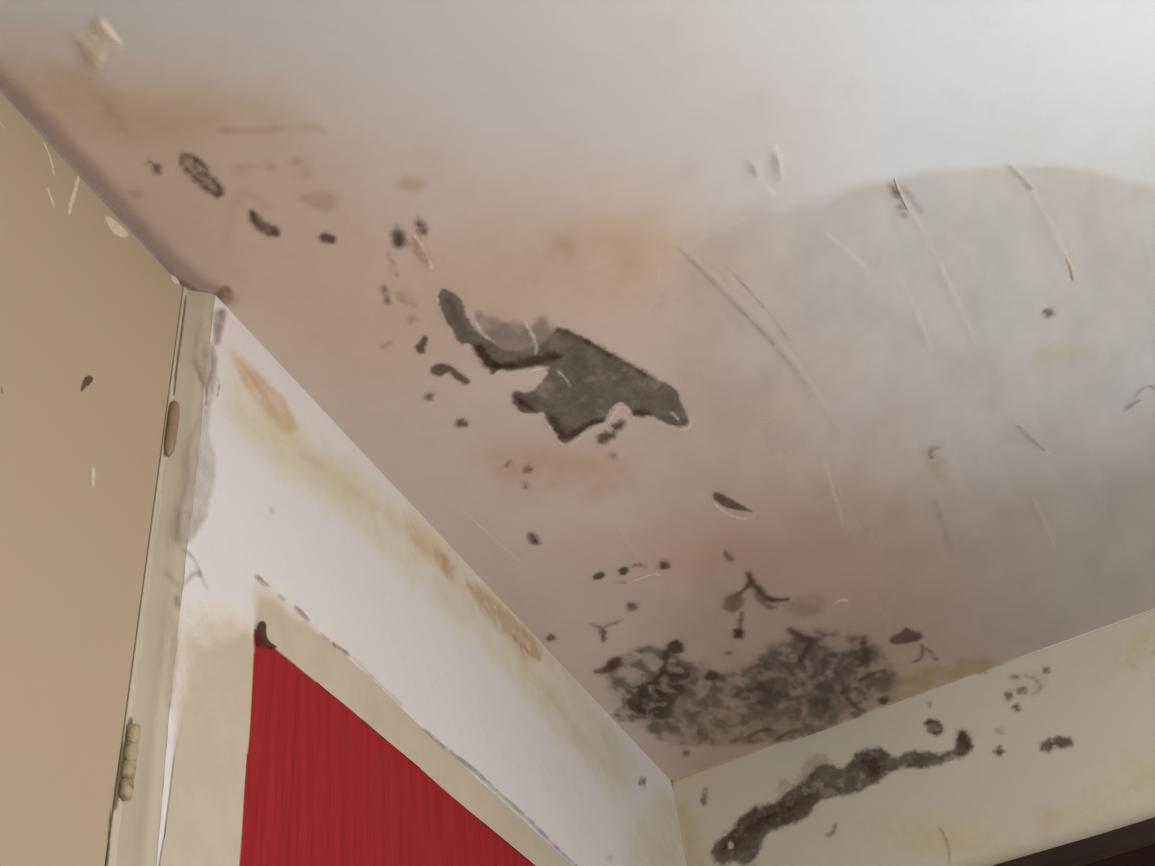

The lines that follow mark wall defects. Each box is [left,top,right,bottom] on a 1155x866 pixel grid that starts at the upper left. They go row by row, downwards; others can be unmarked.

leakage [416,337,427,354]
leakage [432,364,470,384]
leakage [739,573,790,602]
leakage [595,628,895,754]